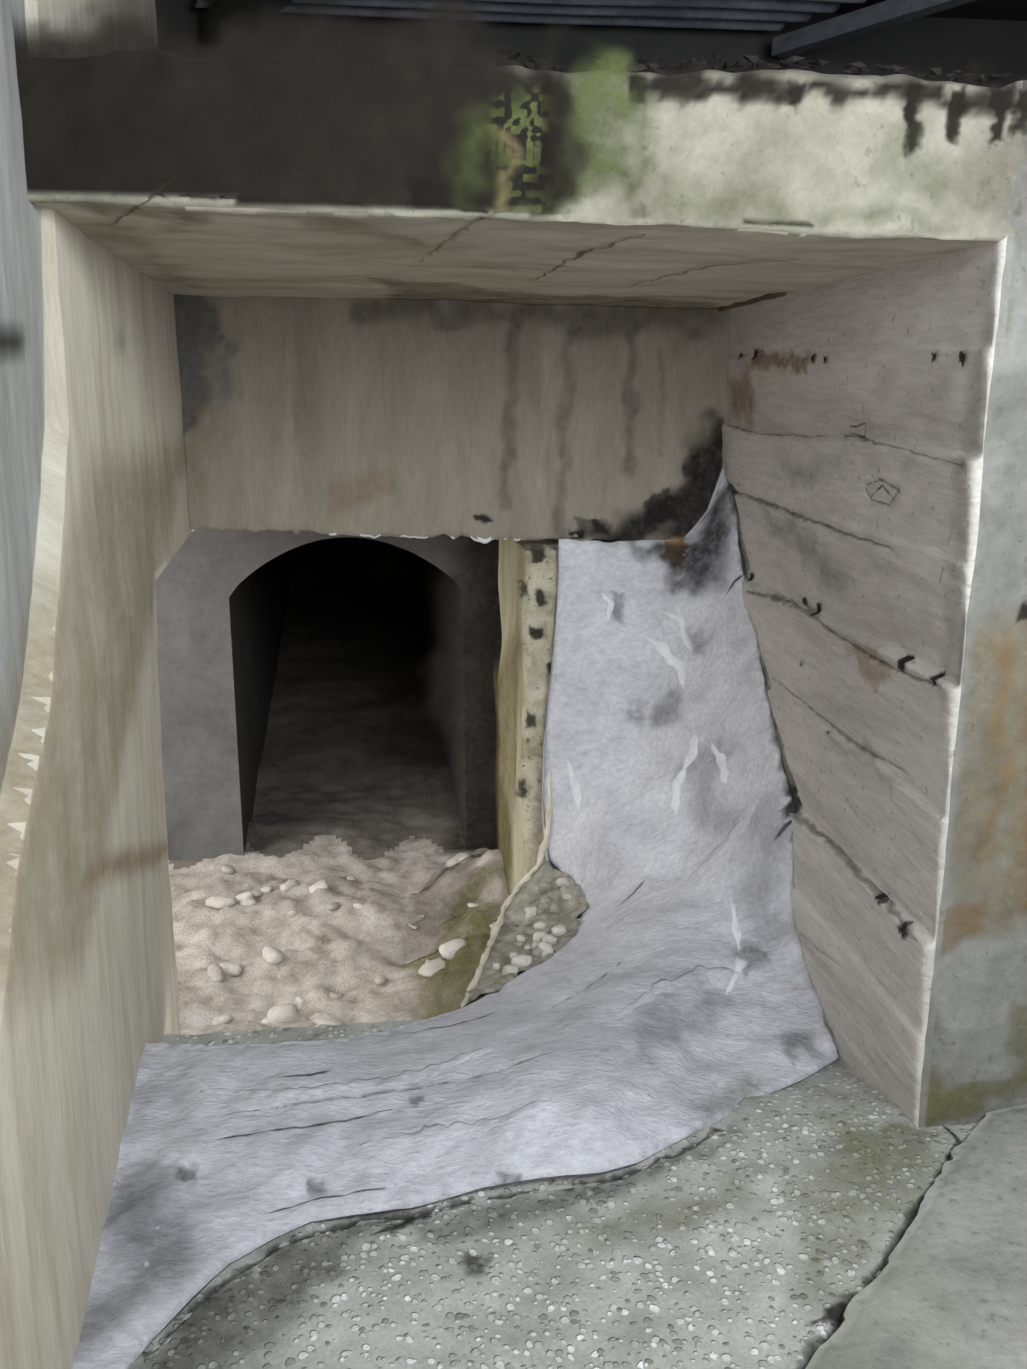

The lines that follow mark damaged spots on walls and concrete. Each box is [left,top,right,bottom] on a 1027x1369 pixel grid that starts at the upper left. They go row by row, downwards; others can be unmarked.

water stain [14,0,582,214]
water stain [630,64,1027,153]
spalling [569,520,608,538]
spalling [460,770,589,1008]
crack [944,1126,962,1161]
crack [801,1197,924,1369]